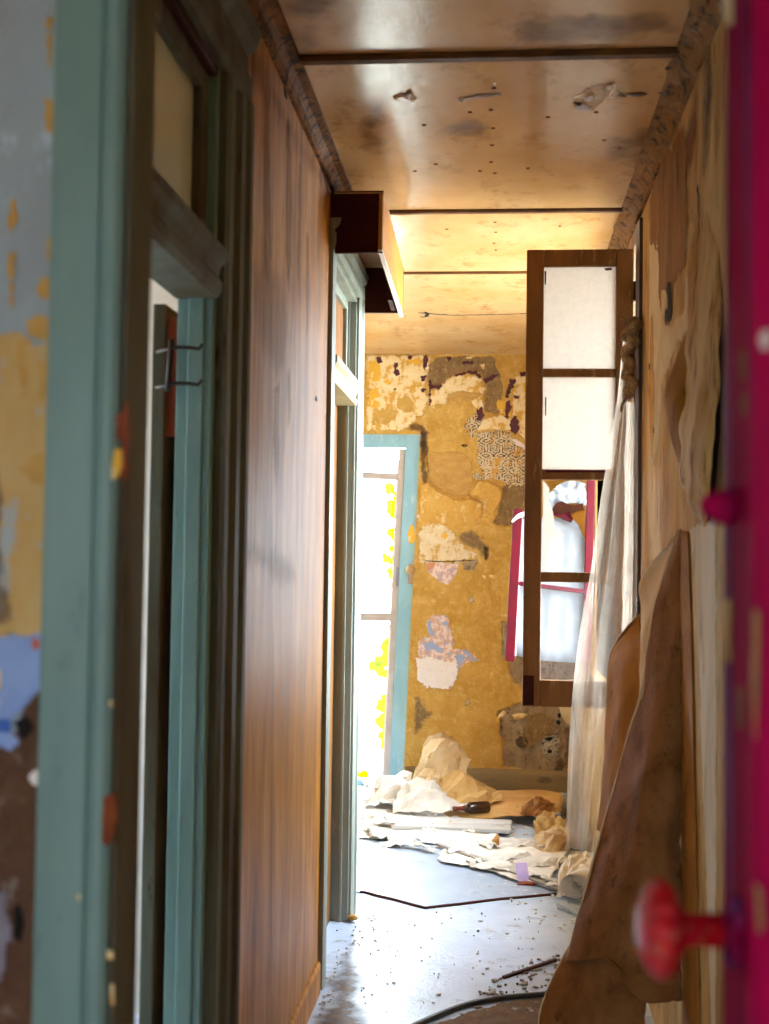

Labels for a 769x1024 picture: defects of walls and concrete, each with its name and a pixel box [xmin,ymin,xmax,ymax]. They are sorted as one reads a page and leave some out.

peeling [43,98,53,135]
peeling [393,93,417,102]
peeling [573,83,664,111]
peeling [6,198,18,232]
peeling [6,252,16,309]
peeling [35,276,49,300]
peeling [649,244,688,464]
peeling [366,354,526,438]
peeling [408,514,494,585]
peeling [0,313,48,1024]
peeling [416,614,480,689]
flaking render [497,703,571,770]